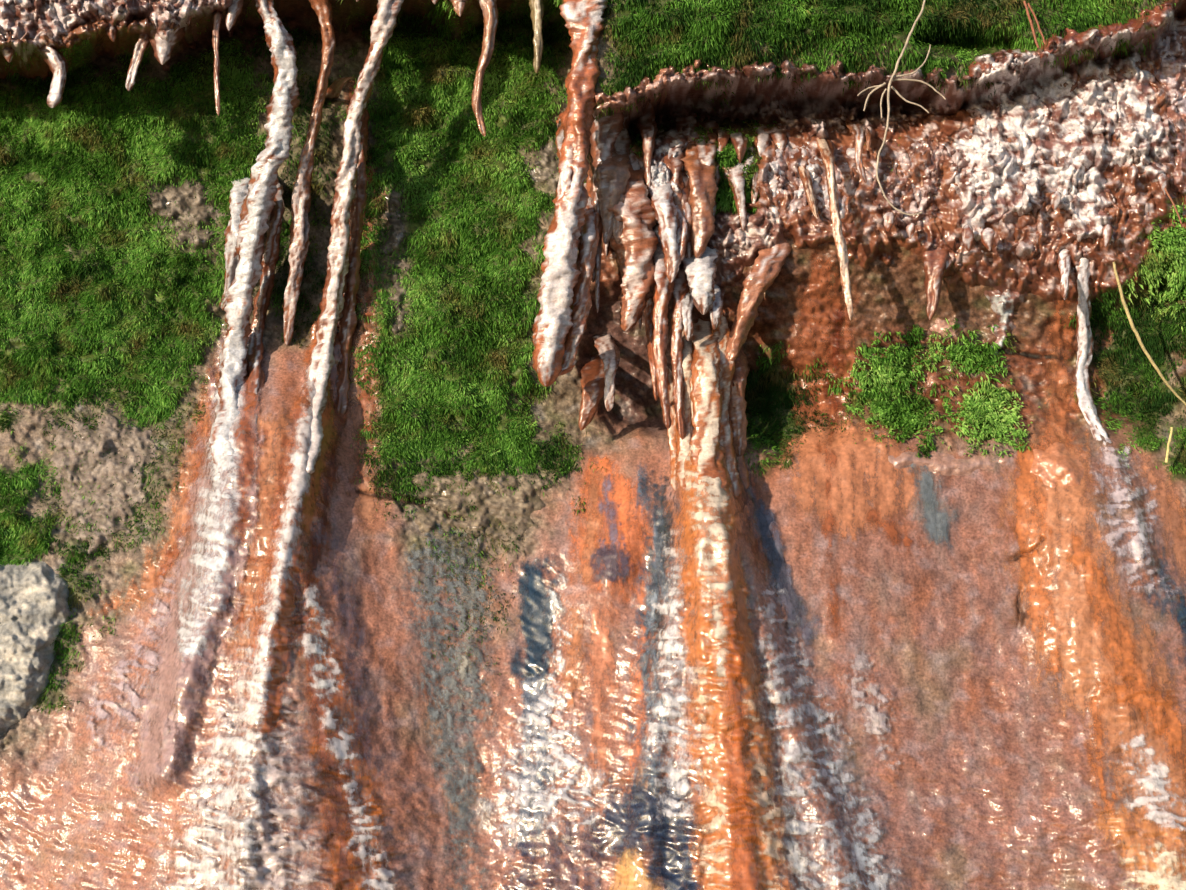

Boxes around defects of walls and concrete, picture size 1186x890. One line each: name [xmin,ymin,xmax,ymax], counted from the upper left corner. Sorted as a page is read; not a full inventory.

water stain [0,0,235,82]
water stain [593,0,1186,355]
corrosion [90,357,221,616]
water stain [87,323,394,890]
corrosion [227,409,293,666]
corrosion [294,155,393,890]
corrosion [563,456,654,800]
corrosion [610,845,660,890]
water stain [402,445,901,890]
corrosion [1000,297,1186,890]
water stain [1095,439,1186,664]
water stain [1122,734,1186,830]